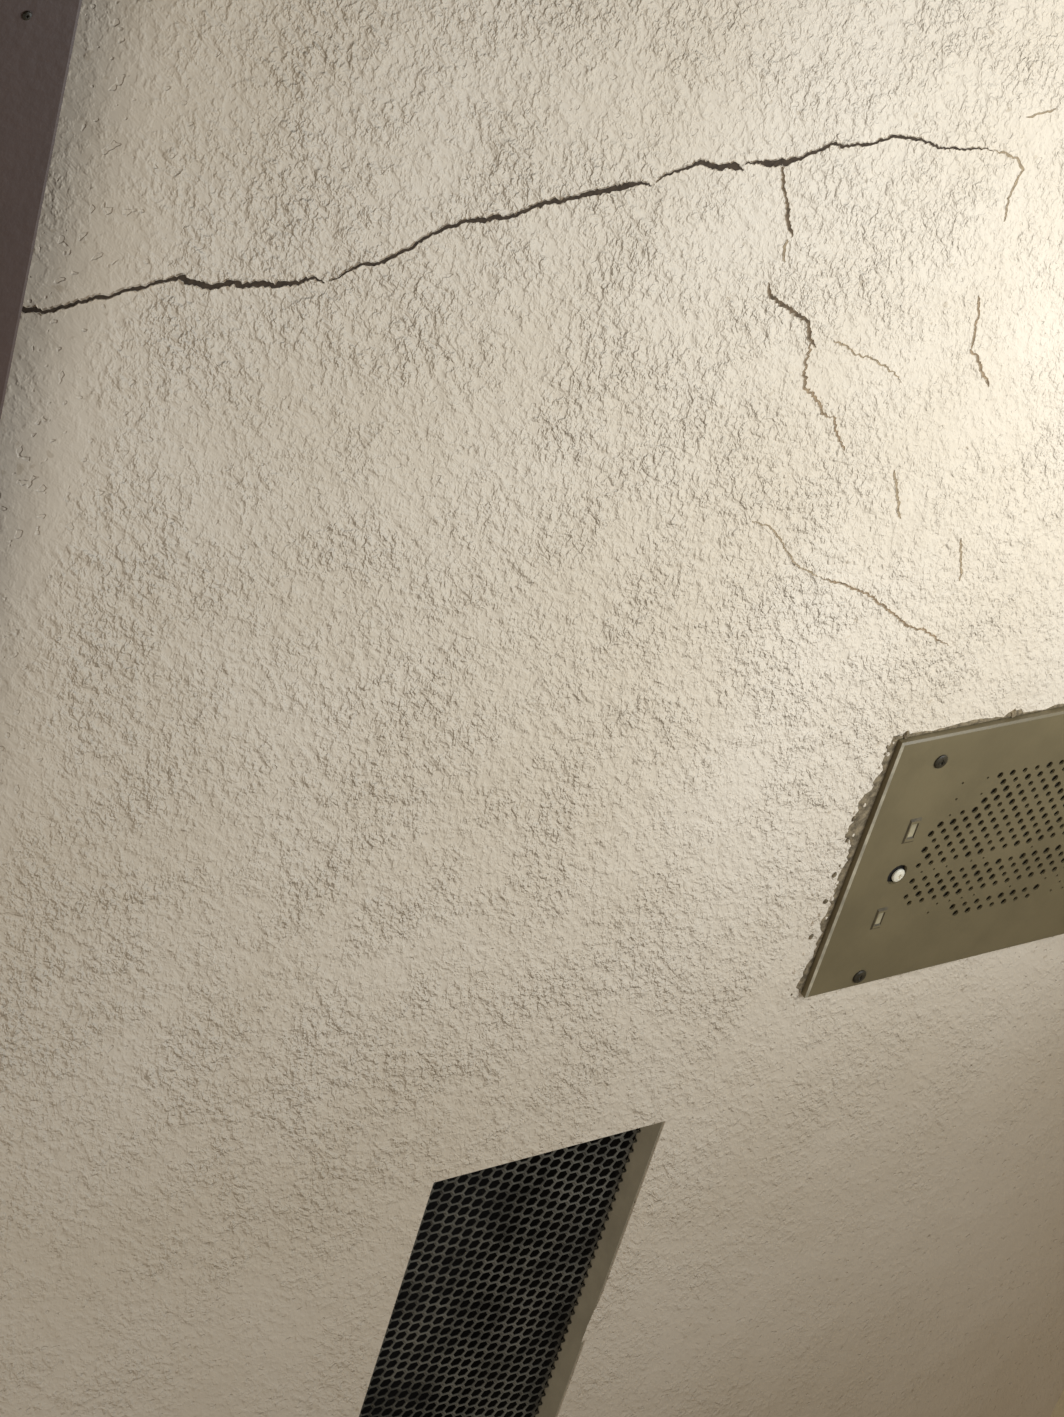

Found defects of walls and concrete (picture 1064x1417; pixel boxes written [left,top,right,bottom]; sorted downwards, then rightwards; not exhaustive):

crack [1027,108,1056,118]
crack [21,133,1025,451]